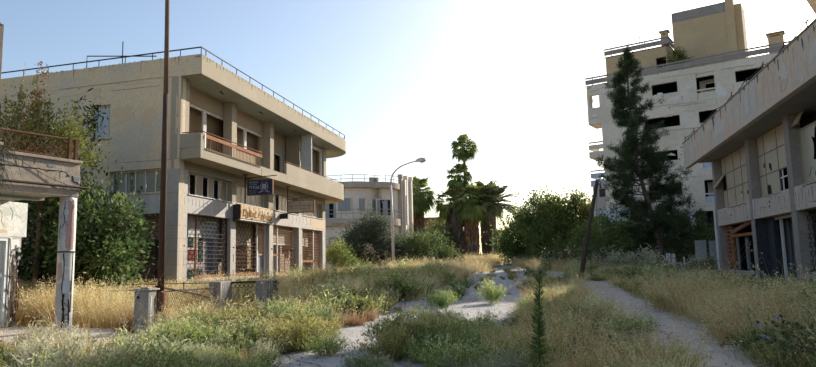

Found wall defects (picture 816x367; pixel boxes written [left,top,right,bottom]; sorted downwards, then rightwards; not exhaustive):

crack [59,201,73,328]
peeling [65,199,75,250]